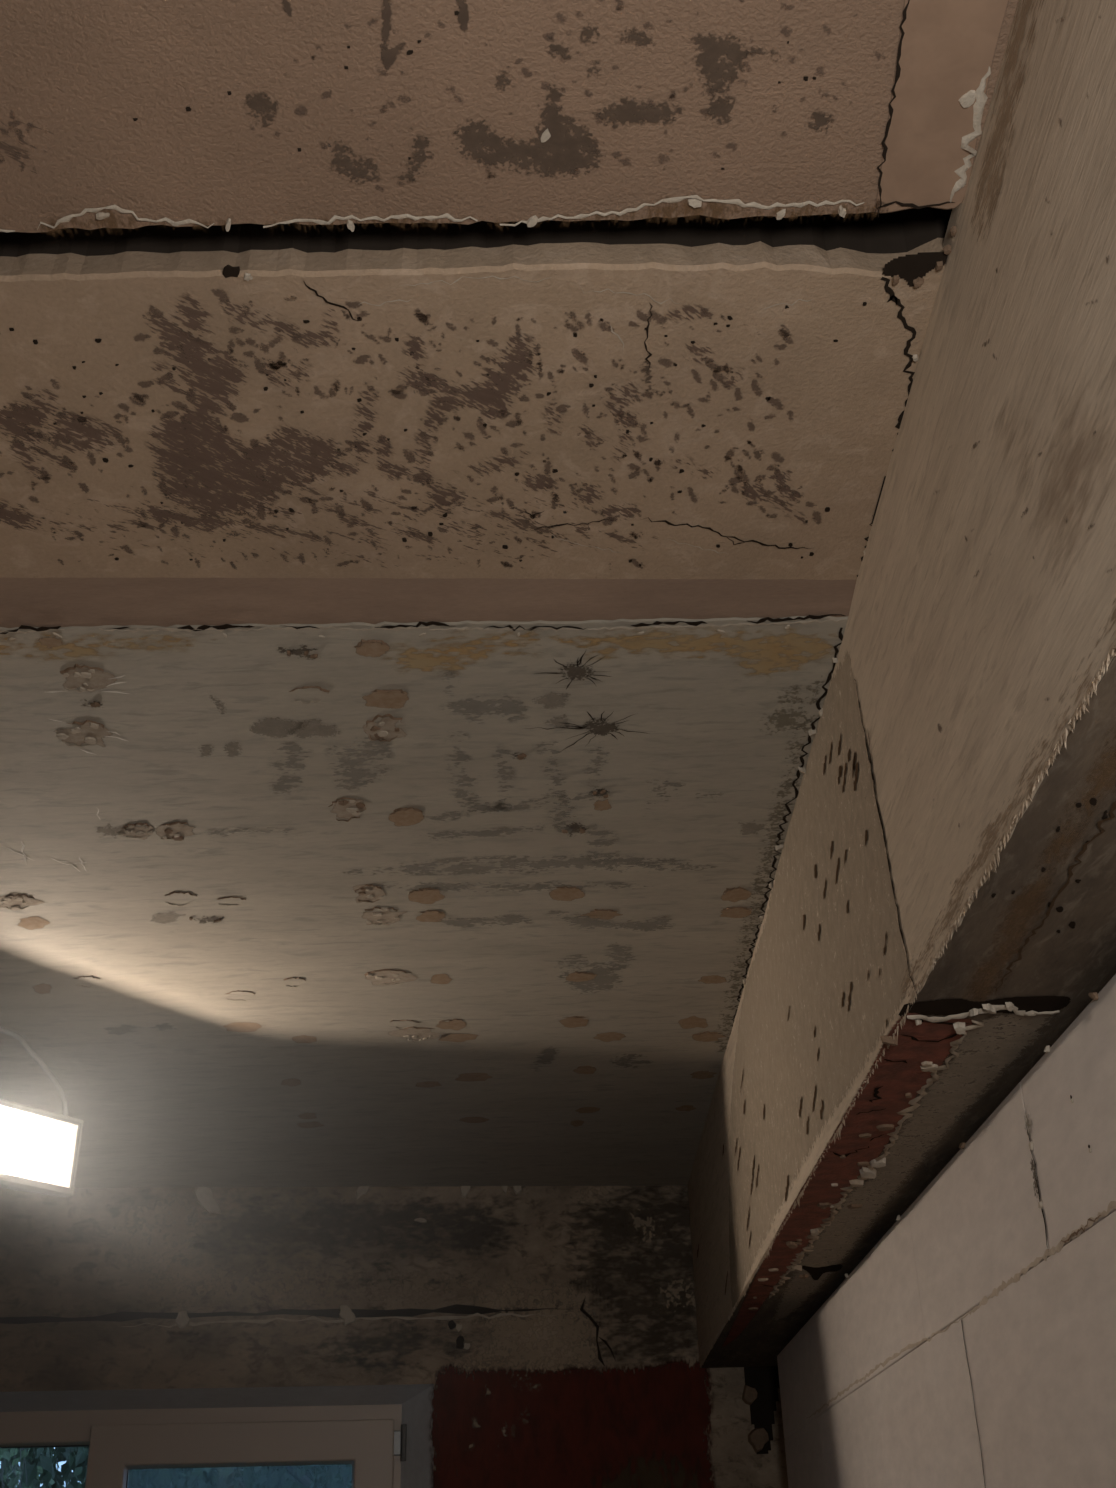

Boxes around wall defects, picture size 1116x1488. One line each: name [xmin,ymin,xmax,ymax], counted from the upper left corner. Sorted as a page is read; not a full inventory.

damp [322,136,432,190]
damp [369,0,406,76]
damp [454,12,803,178]
crack [876,0,956,217]
damp [0,289,821,569]
crack [857,277,918,577]
peeling [99,614,848,659]
spalling [0,893,50,930]
peeling [151,891,246,924]
spalling [722,1002,1014,1347]
crack [1024,1113,1101,1248]
crack [0,1296,616,1366]